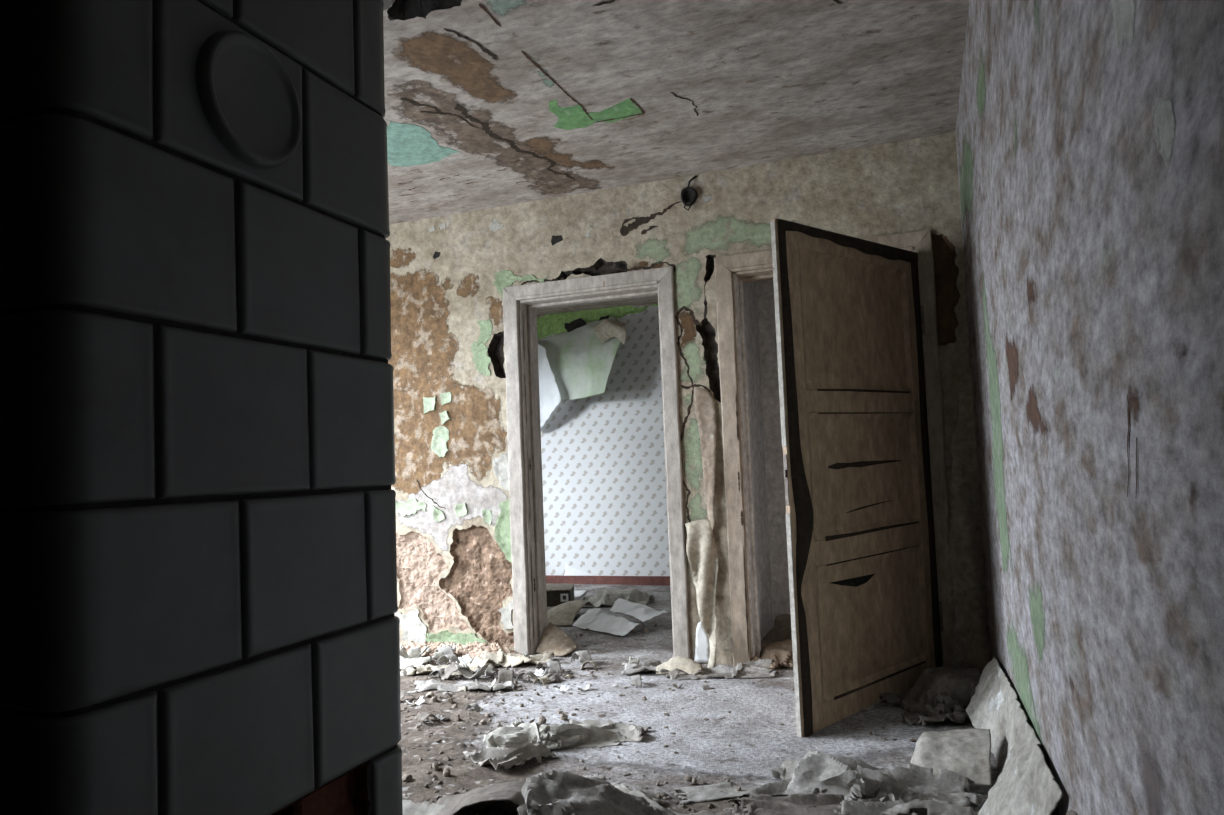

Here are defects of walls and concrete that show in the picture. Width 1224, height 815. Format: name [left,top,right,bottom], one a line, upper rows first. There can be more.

crack [593,0,615,8]
peeling [387,121,459,202]
crack [620,201,682,236]
crack [521,277,565,285]
crack [601,261,676,275]
peeling [471,319,506,378]
spalling [493,239,721,405]
crack [675,306,710,441]
peeling [423,392,452,457]
crack [683,480,691,522]
peeling [682,419,707,521]
spalling [395,498,514,648]